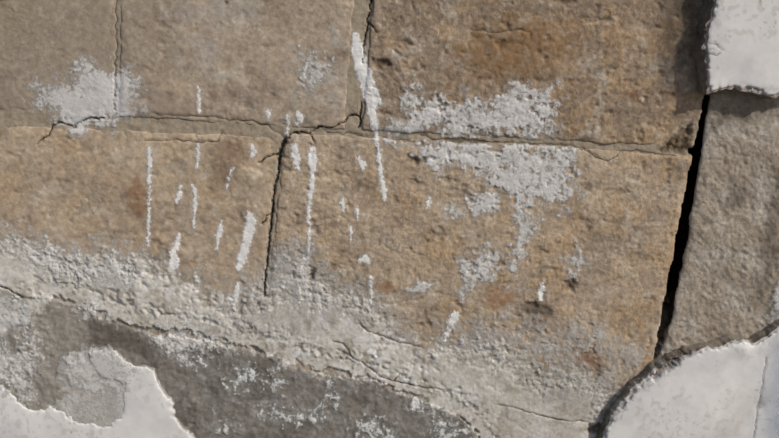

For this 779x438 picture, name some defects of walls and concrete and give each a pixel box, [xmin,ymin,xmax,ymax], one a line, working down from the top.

crack [37,0,118,144]
peeling [23,54,149,138]
peeling [296,44,335,98]
crack [361,0,378,60]
spalling [691,0,773,99]
peeling [0,240,142,297]
peeling [240,243,406,327]
crack [145,95,710,358]
peeling [371,73,779,438]
peeling [0,288,45,405]
peeling [55,345,136,399]
peeling [144,321,238,362]